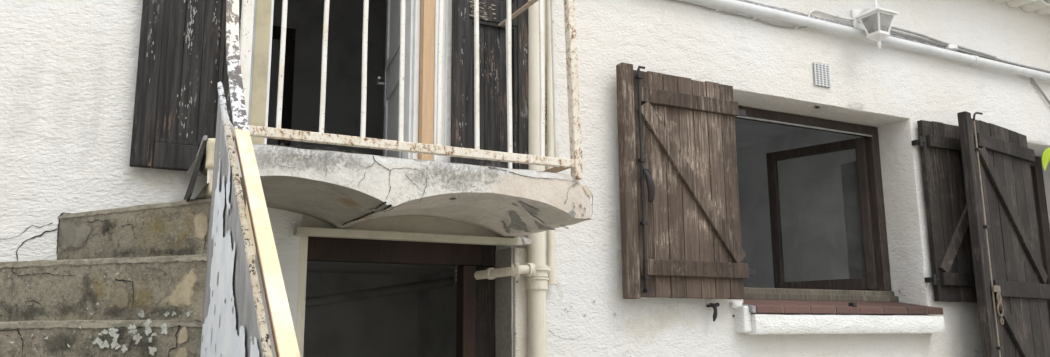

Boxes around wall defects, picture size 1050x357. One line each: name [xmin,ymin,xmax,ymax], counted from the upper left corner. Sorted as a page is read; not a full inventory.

peeling [184,0,197,54]
crack [276,153,427,225]
crack [488,167,593,220]
peeling [502,182,592,233]
crack [7,212,136,277]
peeling [164,135,259,357]